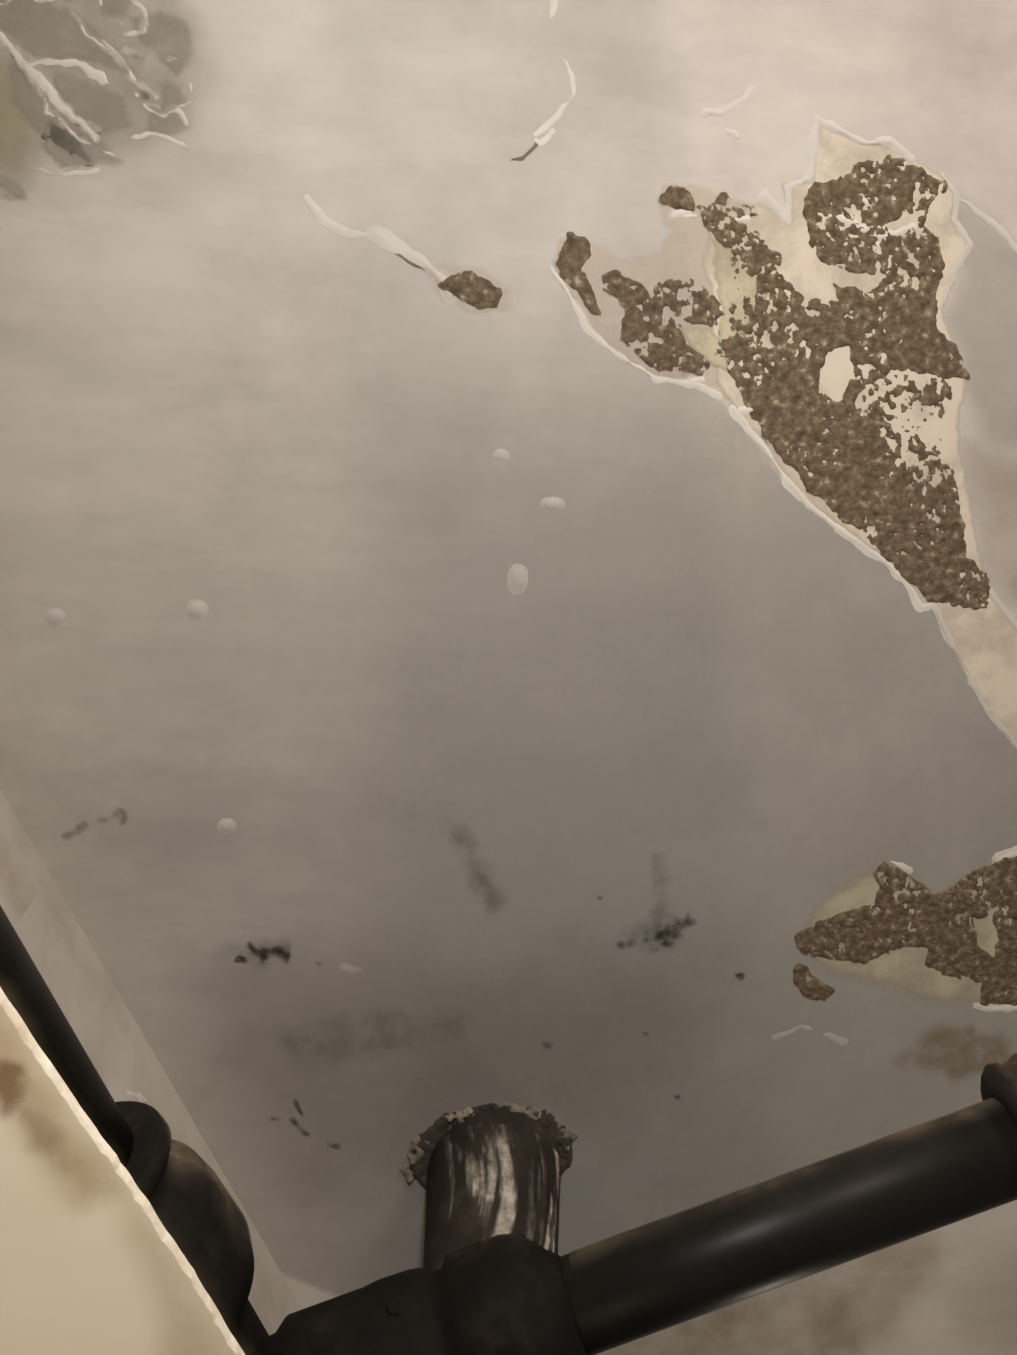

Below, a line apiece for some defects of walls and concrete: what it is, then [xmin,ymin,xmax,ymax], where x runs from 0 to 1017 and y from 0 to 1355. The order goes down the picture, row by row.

crack [549,0,558,18]
crack [510,58,576,161]
peeling [303,194,503,310]
peeling [550,114,1017,750]
damp [249,944,286,957]
peeling [793,846,1017,1012]